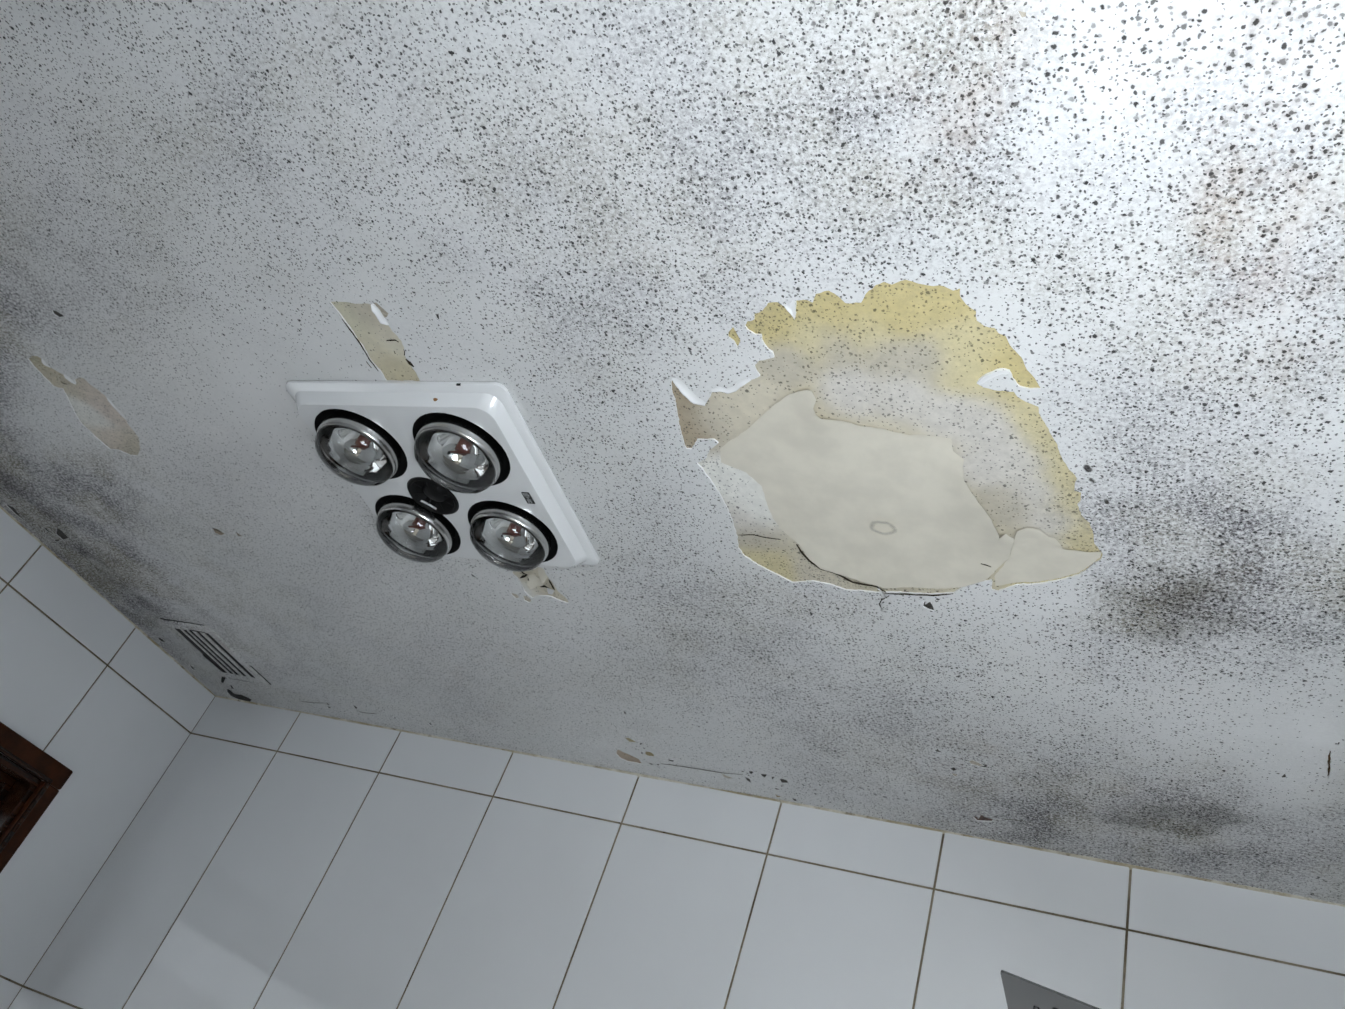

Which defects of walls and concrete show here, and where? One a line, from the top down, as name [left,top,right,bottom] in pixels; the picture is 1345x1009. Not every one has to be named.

peeling [331,302,420,381]
peeling [29,356,140,455]
peeling [672,280,1103,610]
damp [1103,567,1238,653]